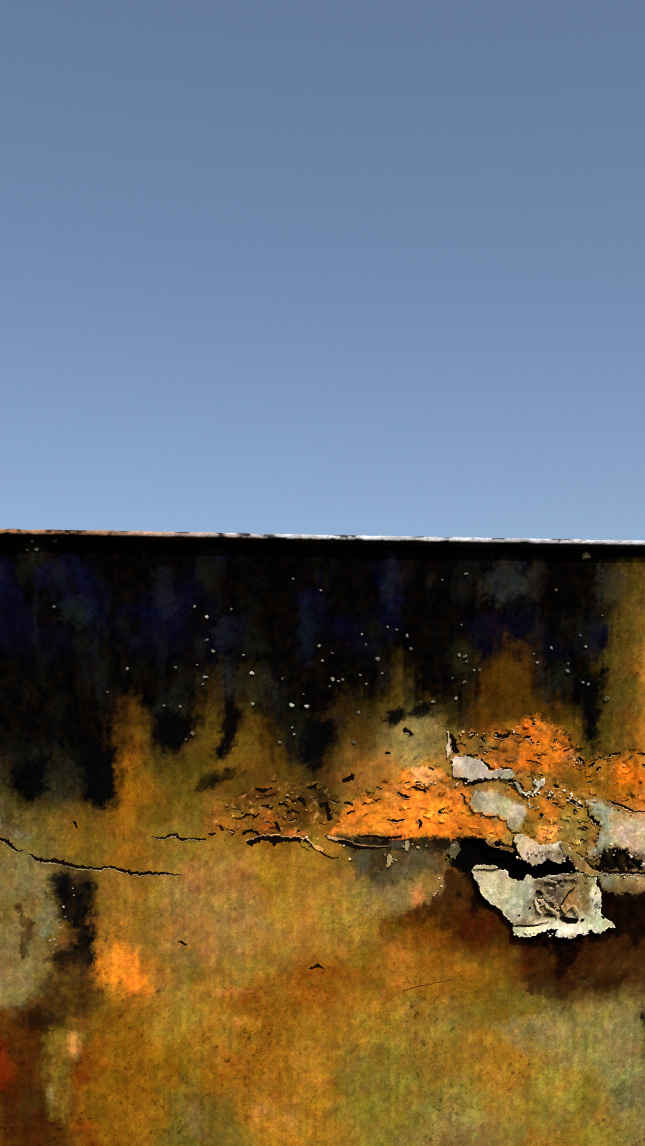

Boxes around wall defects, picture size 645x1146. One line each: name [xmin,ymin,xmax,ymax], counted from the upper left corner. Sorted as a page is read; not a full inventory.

corrosion [637,646,645,690]
crack [0,837,182,878]
crack [151,833,206,842]
leakage [0,539,645,1146]
crack [242,792,410,860]
spalling [197,711,645,939]
corrosion [95,921,159,1006]
corrosion [0,993,111,1146]